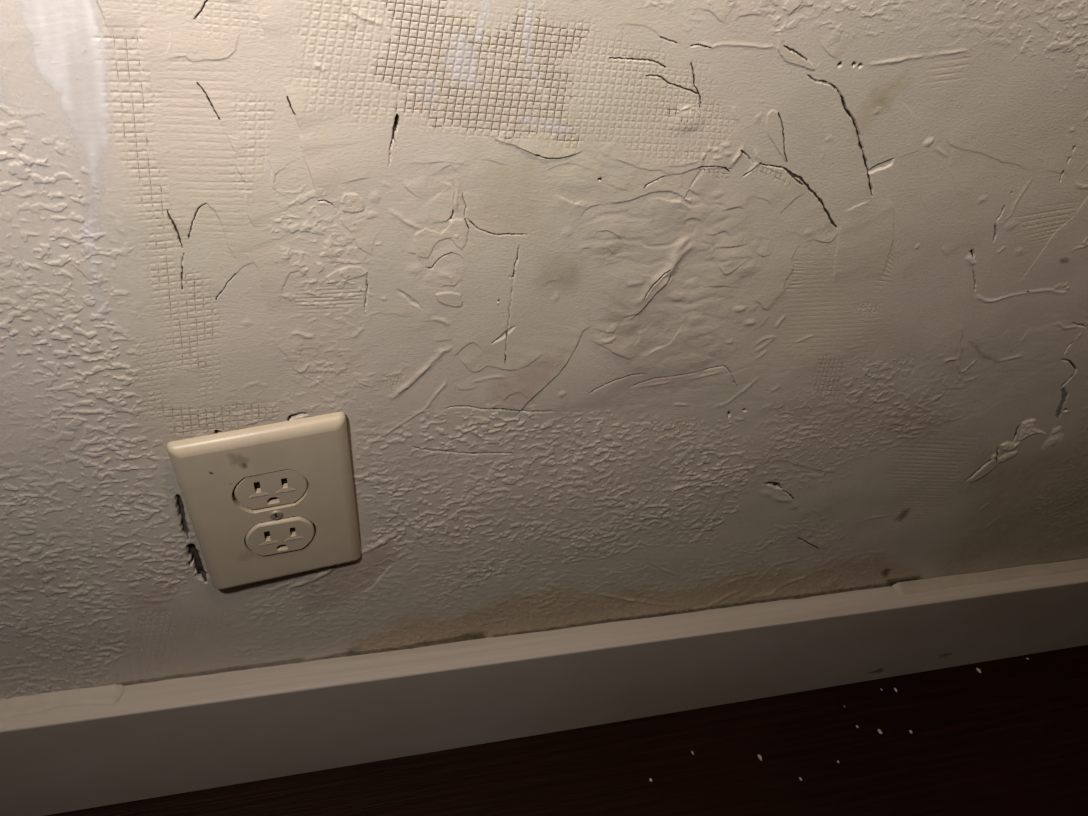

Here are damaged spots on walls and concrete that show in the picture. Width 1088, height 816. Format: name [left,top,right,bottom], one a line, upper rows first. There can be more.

crack [389,114,399,164]
crack [609,6,970,202]
crack [147,135,195,289]
crack [462,194,528,277]
crack [760,163,839,243]
crack [1056,324,1083,418]
flaking render [969,418,1064,482]